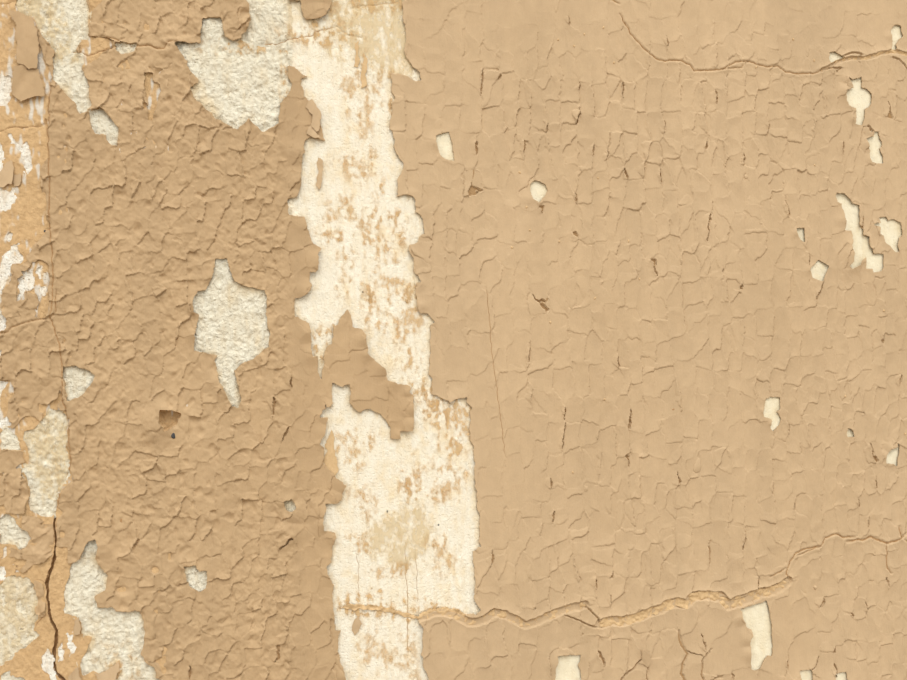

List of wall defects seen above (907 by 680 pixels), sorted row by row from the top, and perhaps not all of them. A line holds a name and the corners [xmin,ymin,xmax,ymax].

peeling [8,0,118,146]
crack [468,142,482,196]
crack [612,0,907,75]
peeling [833,75,883,163]
crack [1,85,72,471]
peeling [830,193,902,282]
peeling [169,0,481,680]
peeling [0,575,39,680]
crack [35,494,66,680]
crack [339,504,907,649]
crack [678,632,735,680]
peeling [731,601,773,671]